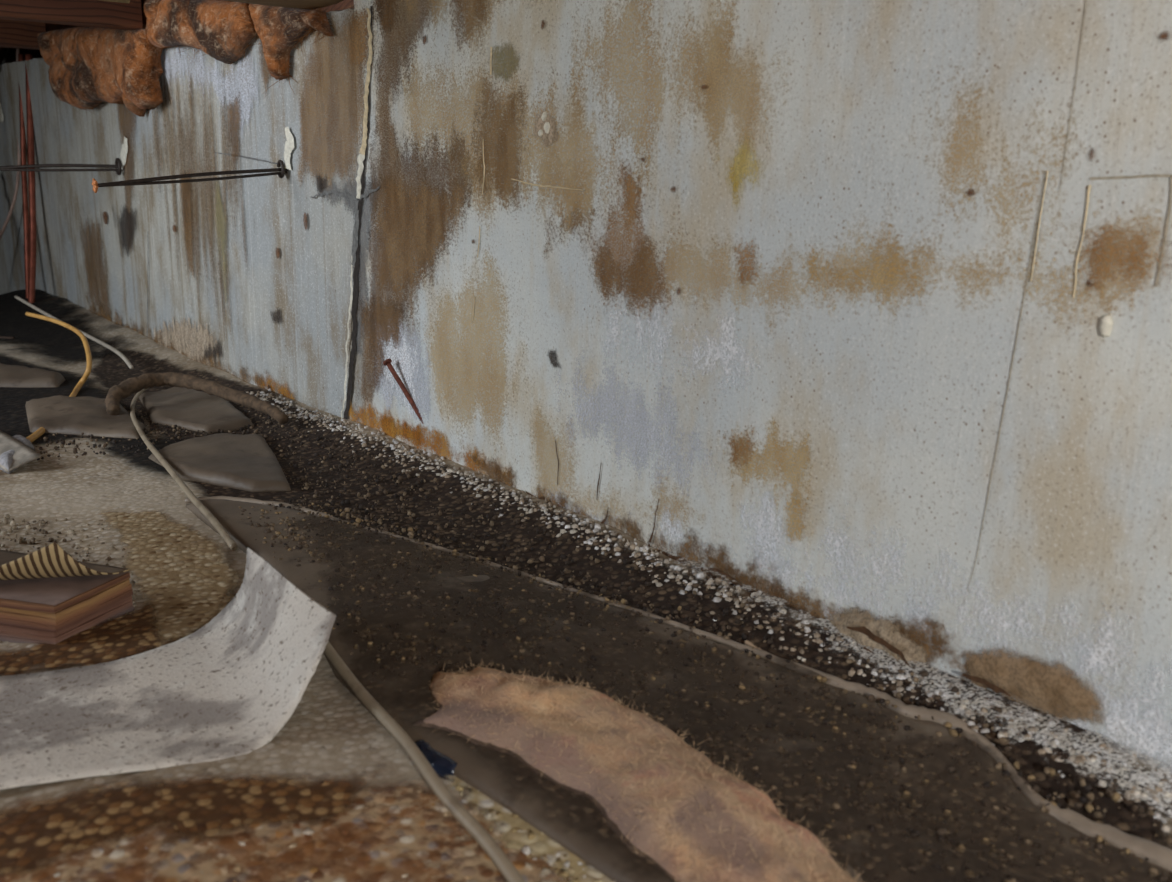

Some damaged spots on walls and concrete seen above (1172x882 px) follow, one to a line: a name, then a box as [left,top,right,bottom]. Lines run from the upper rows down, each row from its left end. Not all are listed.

leakage [80,104,262,388]
leakage [152,38,271,315]
crack [310,6,380,419]
leakage [496,466,516,488]
leakage [284,0,771,437]
leakage [533,225,1172,820]
leakage [944,89,1063,243]
crack [963,0,1087,606]